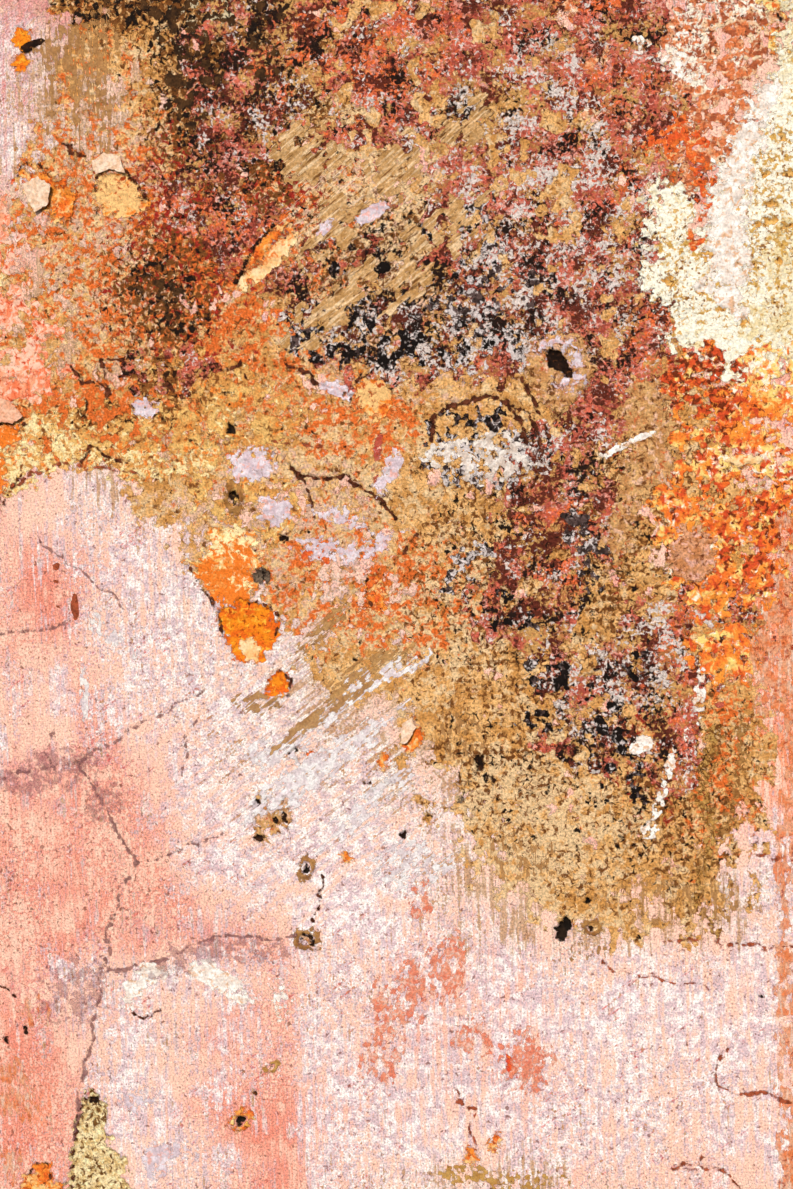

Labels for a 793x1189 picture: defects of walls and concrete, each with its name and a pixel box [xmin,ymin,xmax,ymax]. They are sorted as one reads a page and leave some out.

rust [640,111,718,251]
spalling [677,385,721,433]
spalling [40,435,94,474]
rust [372,434,383,482]
crack [271,440,419,566]
spalling [672,468,771,512]
rust [298,548,331,567]
rust [641,338,793,1189]
spalling [411,794,436,827]
rust [296,853,316,883]
crack [2,691,324,1141]
spalling [745,871,762,914]